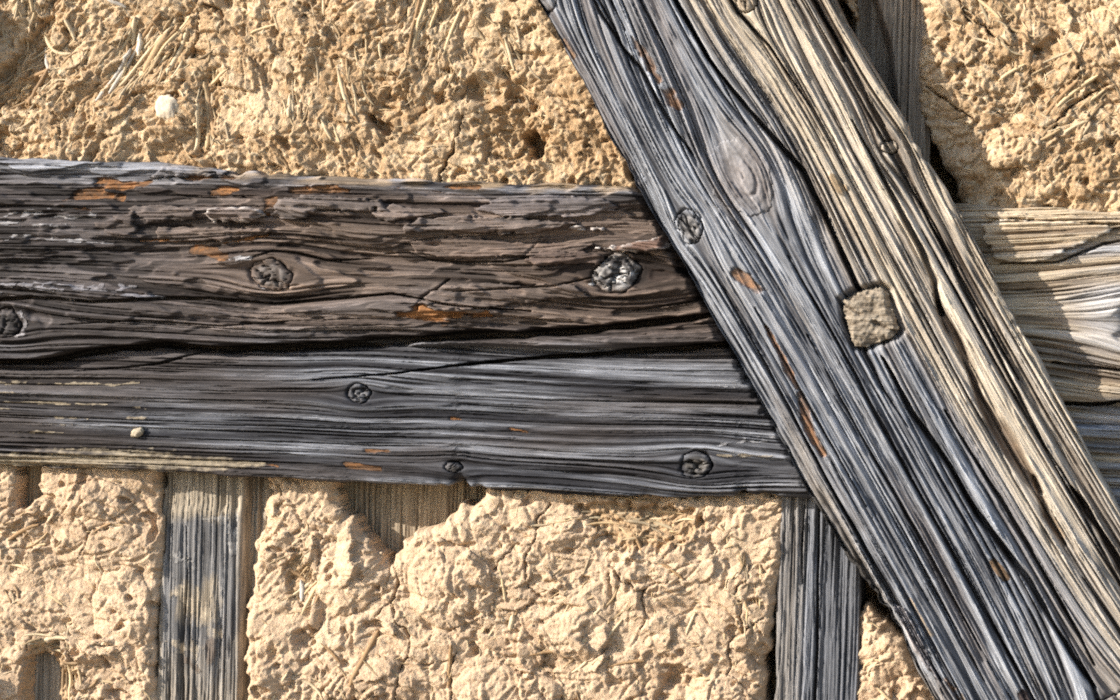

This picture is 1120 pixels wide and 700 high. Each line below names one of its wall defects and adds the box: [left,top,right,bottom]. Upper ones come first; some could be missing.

crack [439,115,464,182]
crack [0,250,901,700]
spalling [18,640,74,700]